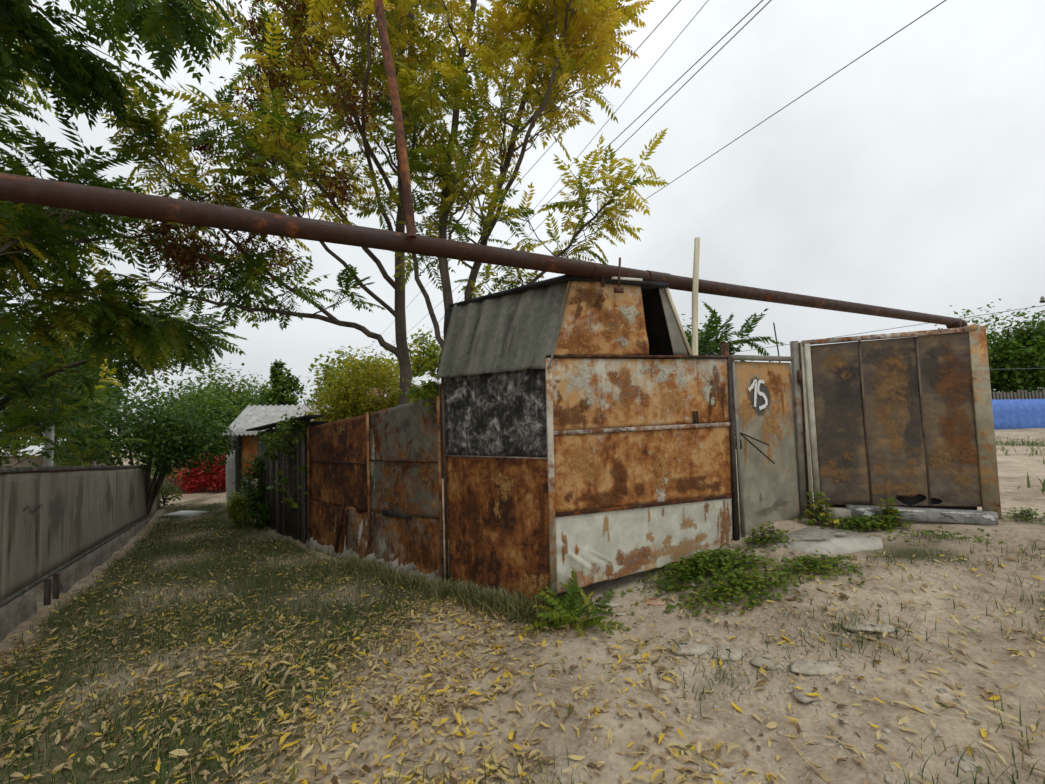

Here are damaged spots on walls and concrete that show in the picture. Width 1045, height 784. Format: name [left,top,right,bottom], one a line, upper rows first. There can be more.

corrosion [558,288,648,355]
corrosion [553,380,605,426]
corrosion [607,368,650,407]
corrosion [707,365,728,420]
corrosion [739,371,785,461]
corrosion [460,472,514,574]
corrosion [517,498,548,593]
corrosion [562,533,579,563]
corrosion [565,460,644,542]
corrosion [605,476,731,579]